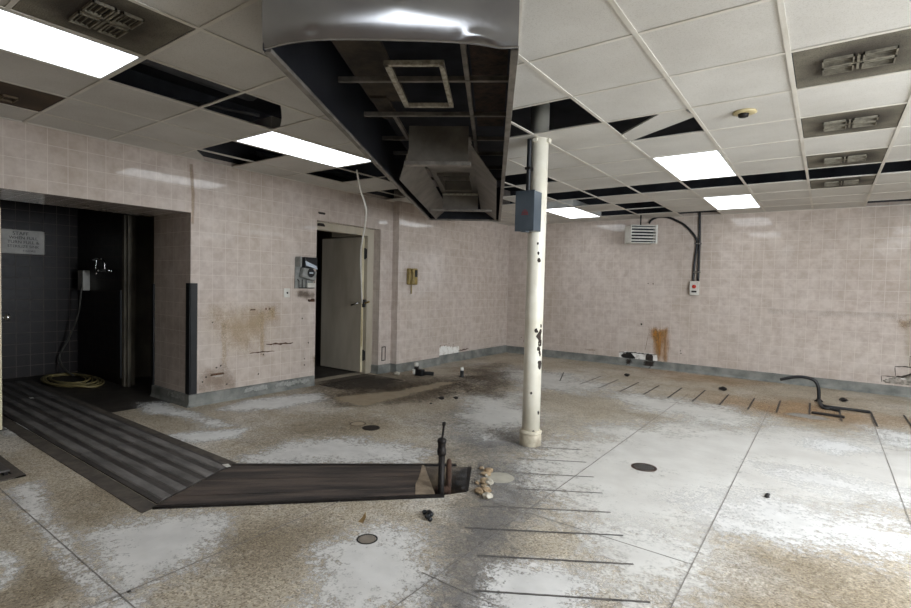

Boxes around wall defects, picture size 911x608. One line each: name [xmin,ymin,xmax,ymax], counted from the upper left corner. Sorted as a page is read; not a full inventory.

peeling [534,324,542,370]
corrosion [653,329,667,359]
spalling [881,356,911,385]
water stain [139,365,911,608]
water stain [0,481,237,608]